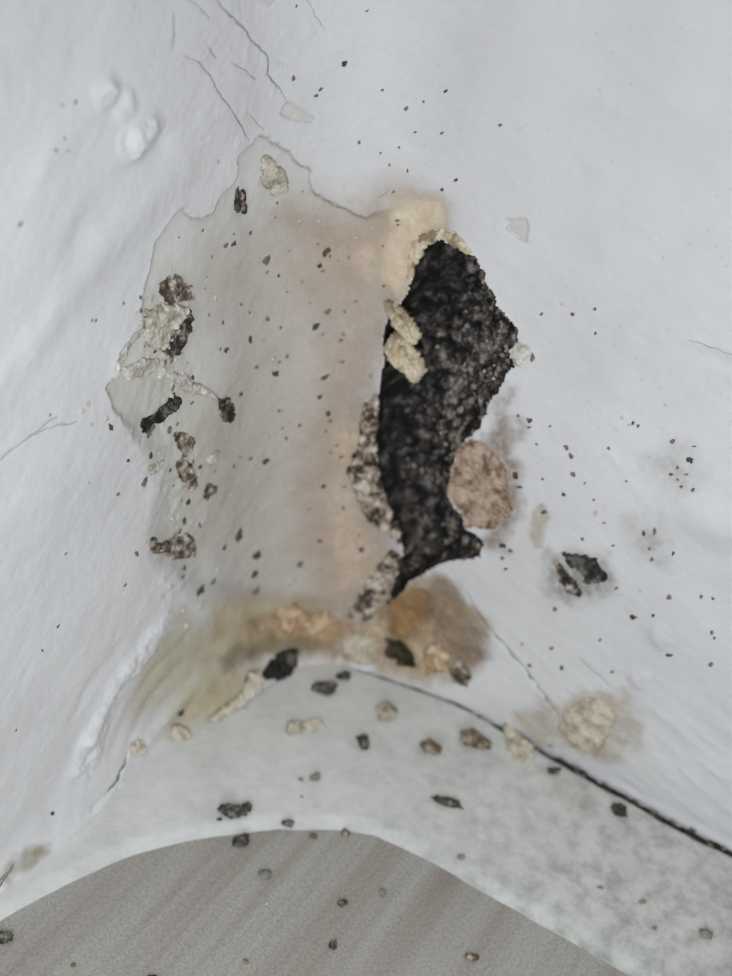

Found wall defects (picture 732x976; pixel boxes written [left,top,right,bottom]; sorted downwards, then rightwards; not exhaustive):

crack [172,1,284,140]
damp [313,188,447,313]
crack [0,417,78,460]
peeling [89,136,530,688]
damp [307,332,385,606]
damp [492,420,523,503]
damp [488,520,513,570]
damp [137,550,310,724]
peeling [206,666,265,723]